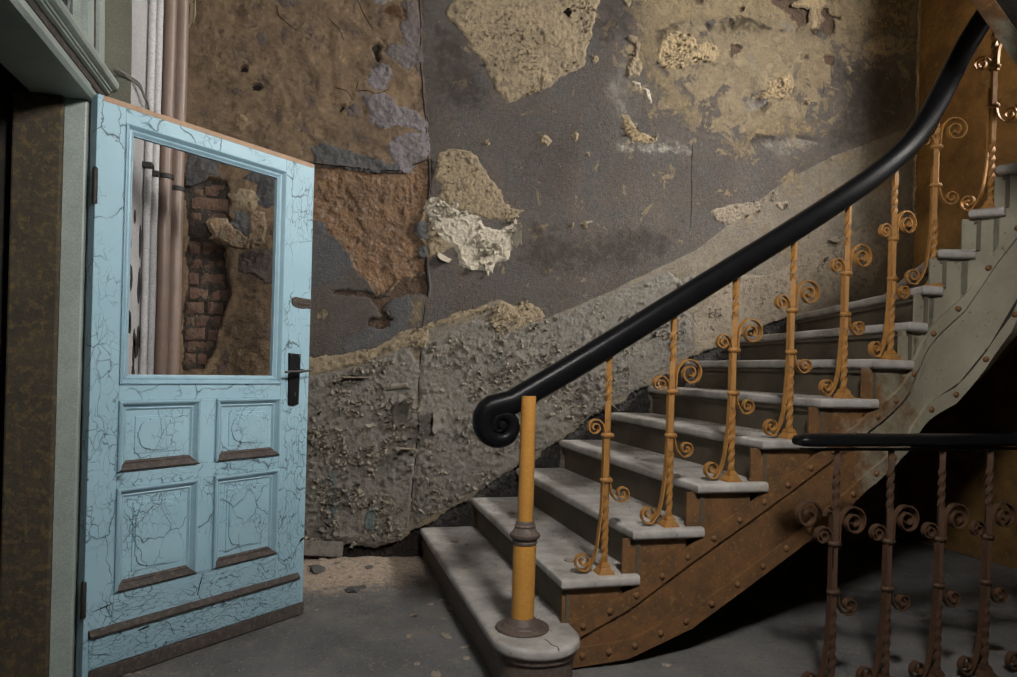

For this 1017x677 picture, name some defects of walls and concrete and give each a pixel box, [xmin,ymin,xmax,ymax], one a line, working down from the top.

spalling [771,0,841,36]
peeling [444,0,600,103]
peeling [655,31,741,70]
peeling [752,73,794,101]
peeling [711,189,791,226]
flaking render [182,179,231,371]
peeling [299,149,699,557]